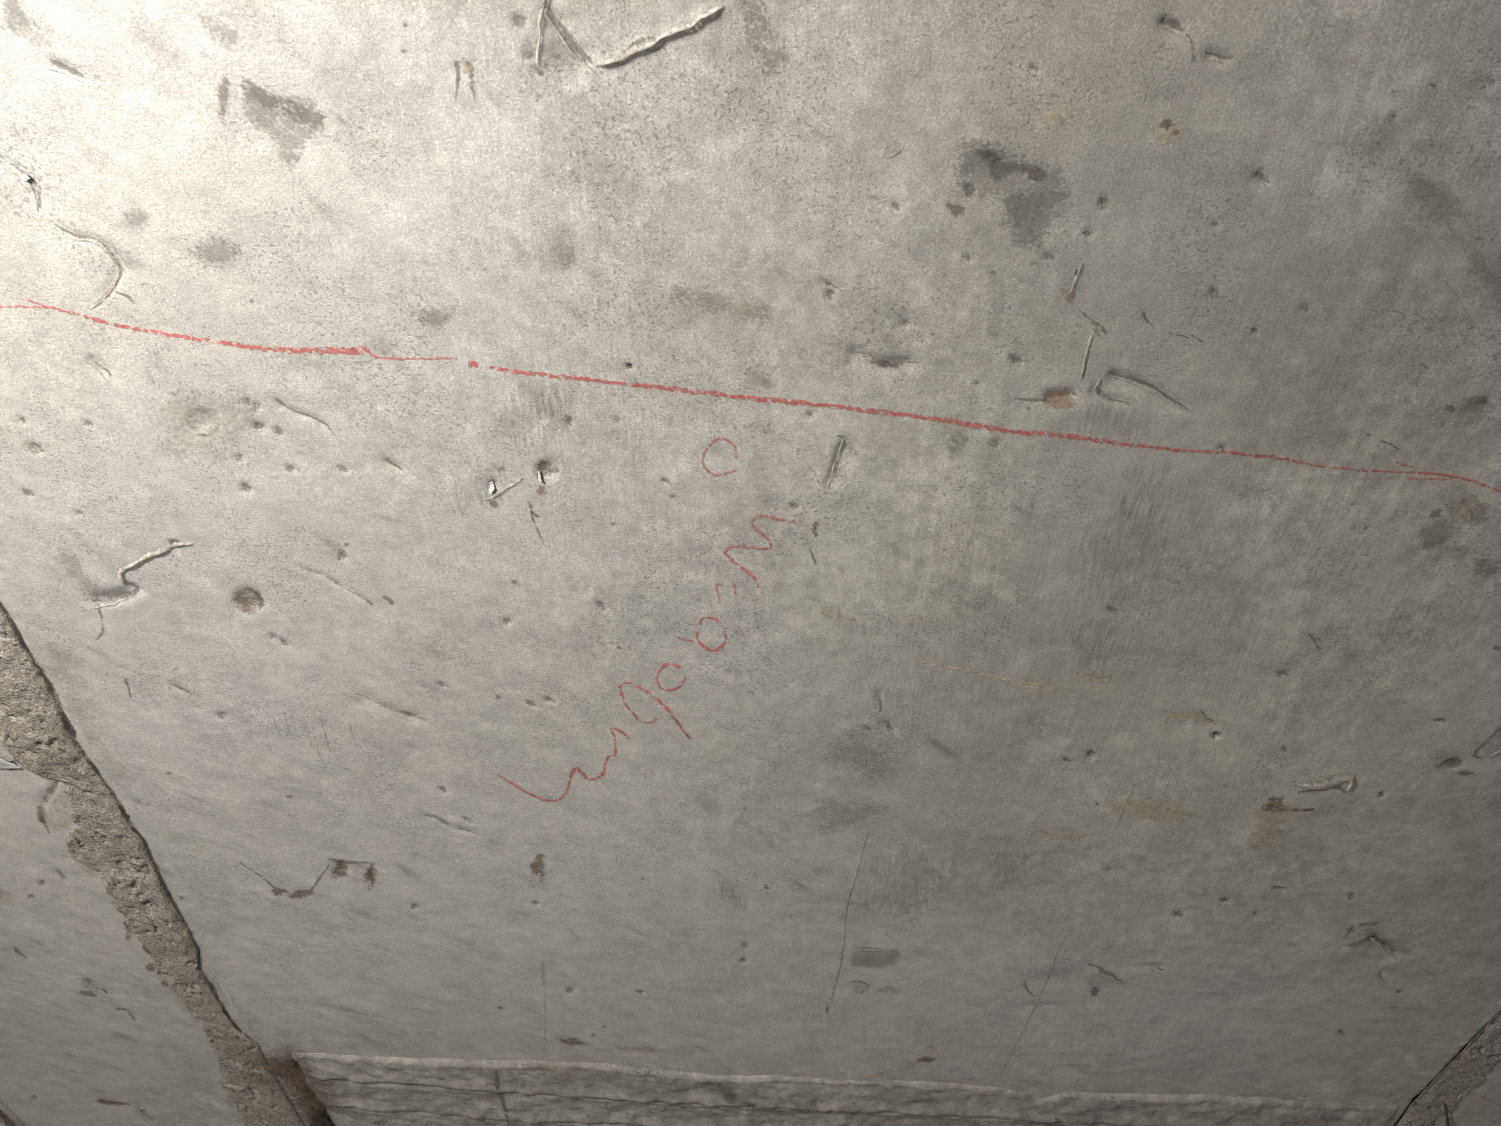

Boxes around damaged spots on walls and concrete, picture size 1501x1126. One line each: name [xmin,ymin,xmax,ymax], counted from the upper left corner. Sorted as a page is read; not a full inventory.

crack [1414,1013,1501,1104]